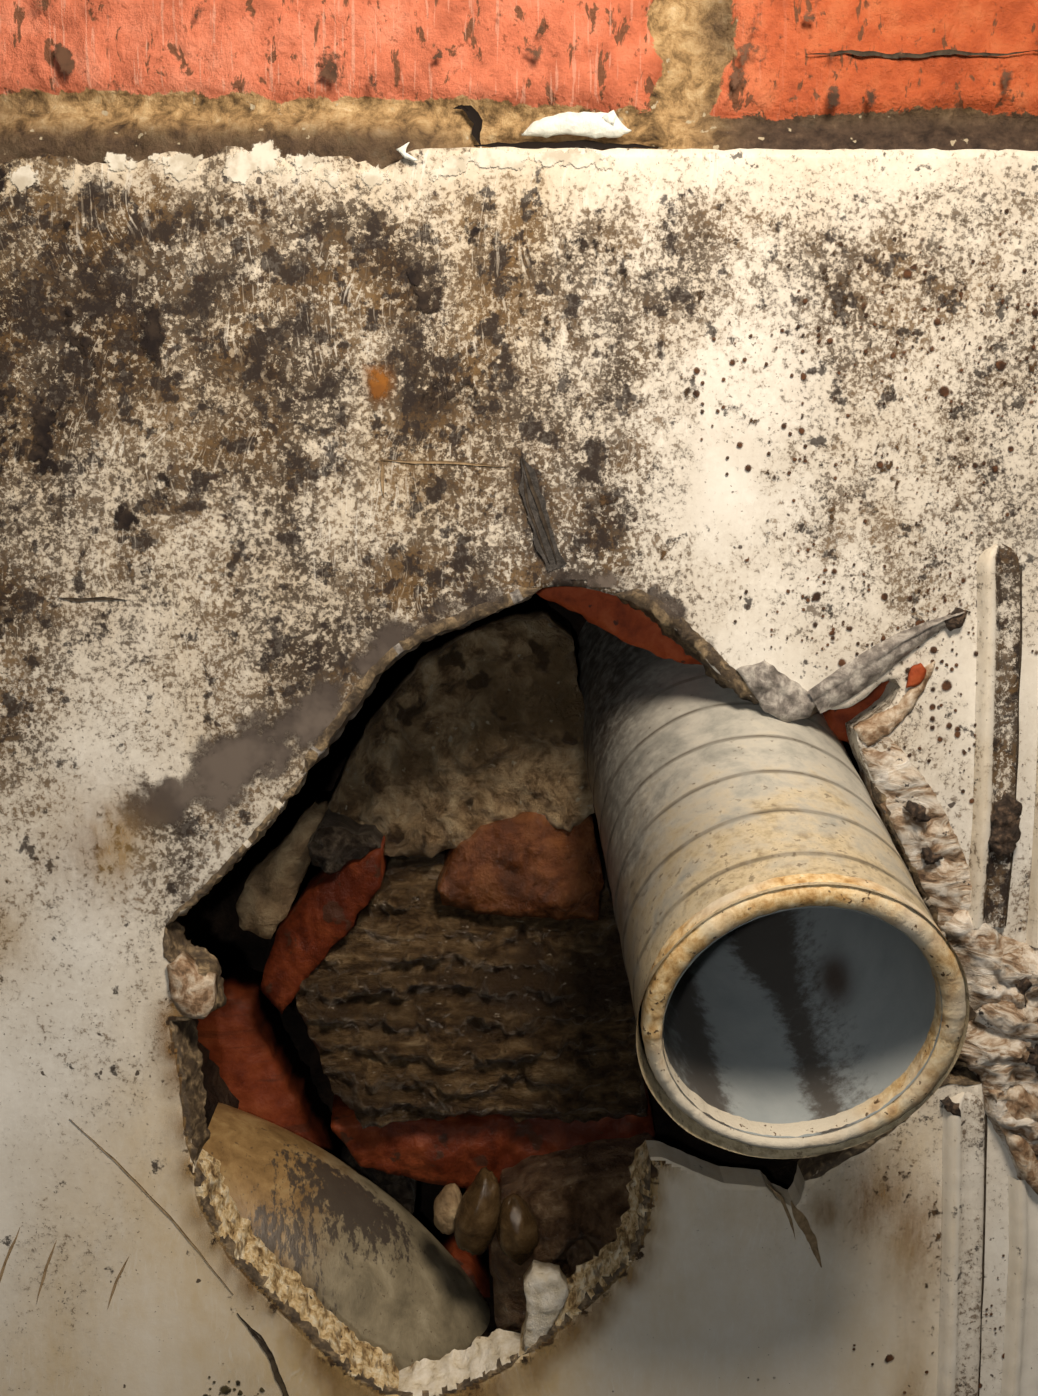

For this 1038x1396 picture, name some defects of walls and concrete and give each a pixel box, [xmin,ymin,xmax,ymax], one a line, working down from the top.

crack [805,49,1038,59]
peeling [7,164,39,191]
peeling [105,152,203,181]
peeling [223,140,389,192]
peeling [396,110,632,181]
corrosion [366,367,391,400]
spalling [614,588,759,704]
spalling [163,587,669,1396]
spalling [854,724,1038,1195]
leakage [863,1166,943,1300]
leakage [203,1376,265,1396]
crack [237,1313,289,1396]